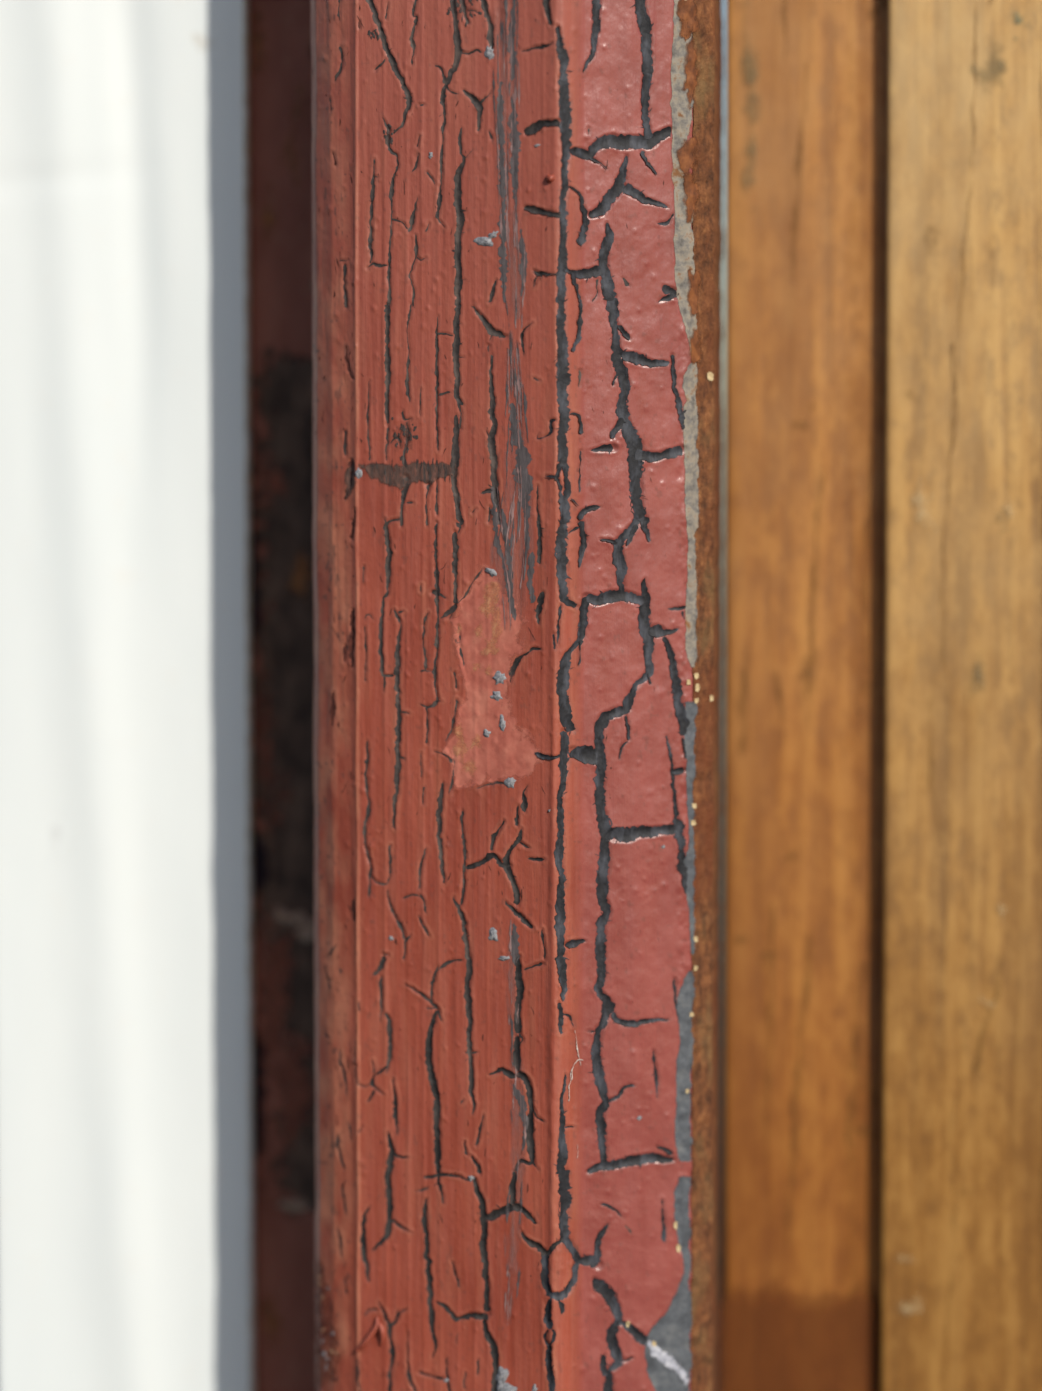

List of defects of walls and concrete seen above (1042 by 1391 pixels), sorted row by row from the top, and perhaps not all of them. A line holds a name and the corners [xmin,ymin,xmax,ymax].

peeling [442,566,544,793]
crack [325,0,690,1391]
peeling [683,702,698,954]
peeling [645,971,695,1391]